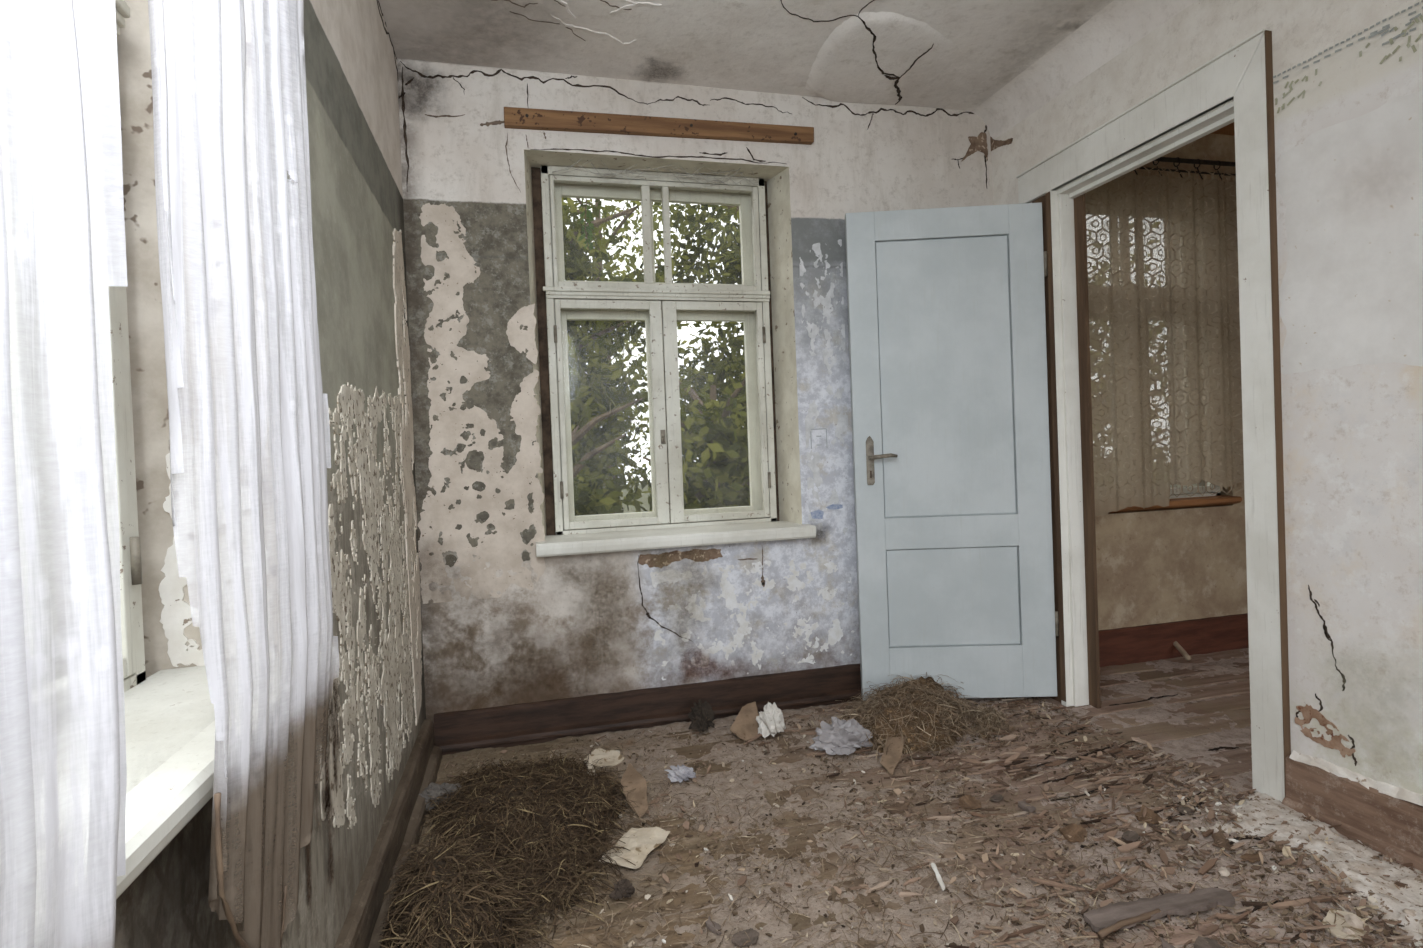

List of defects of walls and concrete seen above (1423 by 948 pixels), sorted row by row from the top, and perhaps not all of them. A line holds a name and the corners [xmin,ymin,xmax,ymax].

crack [377,0,987,192]
flaking render [961,132,1013,162]
peeling [1275,91,1423,375]
peeling [799,239,848,538]
peeling [320,203,546,829]
crack [637,555,694,643]
peeling [638,548,856,680]
crack [1296,585,1346,718]
flaking render [1294,703,1356,758]
crack [1348,735,1357,766]